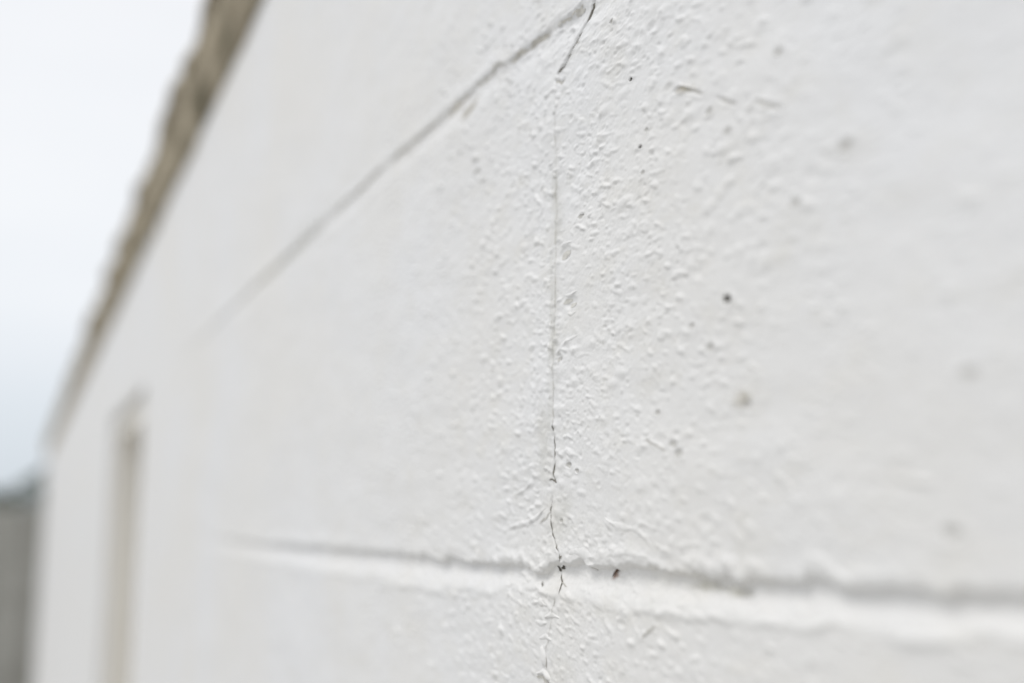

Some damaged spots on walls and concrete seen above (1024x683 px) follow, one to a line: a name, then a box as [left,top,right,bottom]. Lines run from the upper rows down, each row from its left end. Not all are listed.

crack [556,2,596,84]
crack [540,146,566,594]